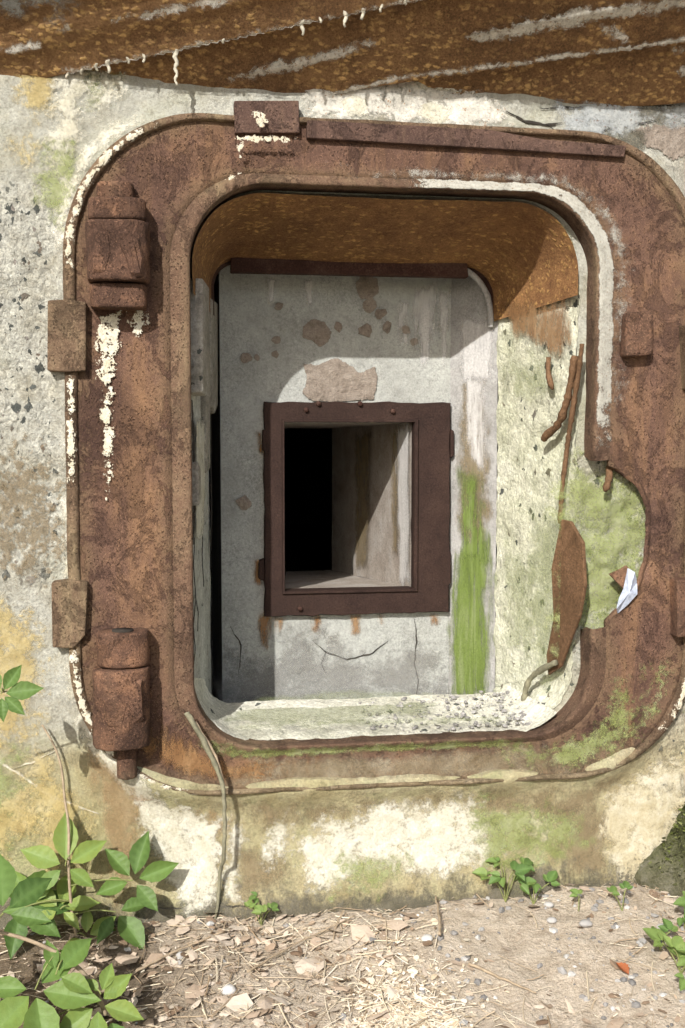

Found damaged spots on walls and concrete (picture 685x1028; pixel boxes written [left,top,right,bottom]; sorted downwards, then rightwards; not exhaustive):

crack [506,105,586,129]
spalling [302,319,342,347]
corrosion [507,302,571,354]
peeling [65,374,78,483]
peeling [94,310,150,500]
flaking render [303,358,378,402]
corrosion [355,432,371,566]
crack [313,641,385,673]
crack [412,620,420,694]
corrosion [145,737,275,780]
water stain [64,668,685,927]
water stain [0,899,13,930]